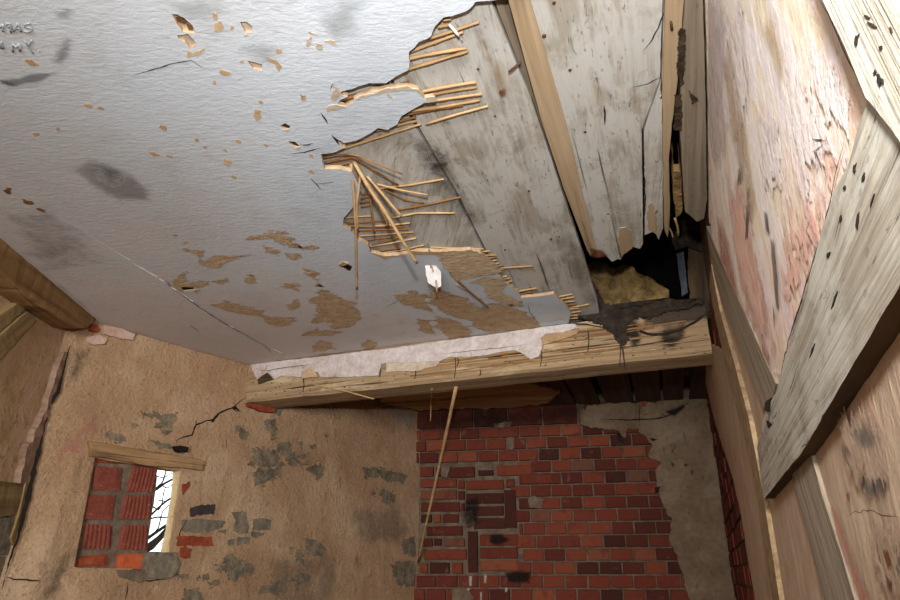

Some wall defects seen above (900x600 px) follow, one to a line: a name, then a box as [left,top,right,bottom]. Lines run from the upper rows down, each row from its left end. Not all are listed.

flaking render [175,14,205,57]
peeling [212,13,252,37]
crack [133,60,203,76]
flaking render [240,48,283,71]
flaking render [356,85,436,103]
peeling [173,234,249,268]
peeling [170,271,228,293]
peeling [210,230,361,356]
peeling [371,249,541,340]
flaking render [131,408,189,453]
crack [176,397,246,447]
flaking render [235,408,324,488]